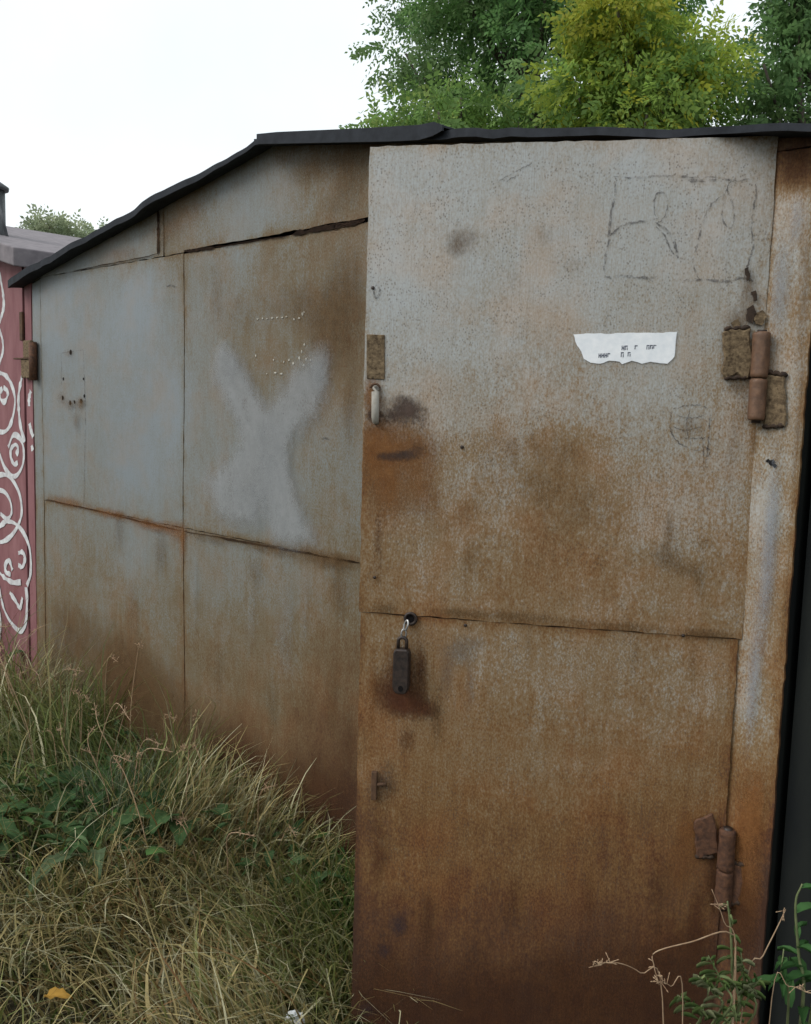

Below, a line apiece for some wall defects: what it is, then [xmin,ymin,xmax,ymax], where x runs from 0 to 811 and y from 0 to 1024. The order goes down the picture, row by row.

rust [363,386,431,510]
rust [376,660,436,717]
rust [360,937,704,1024]